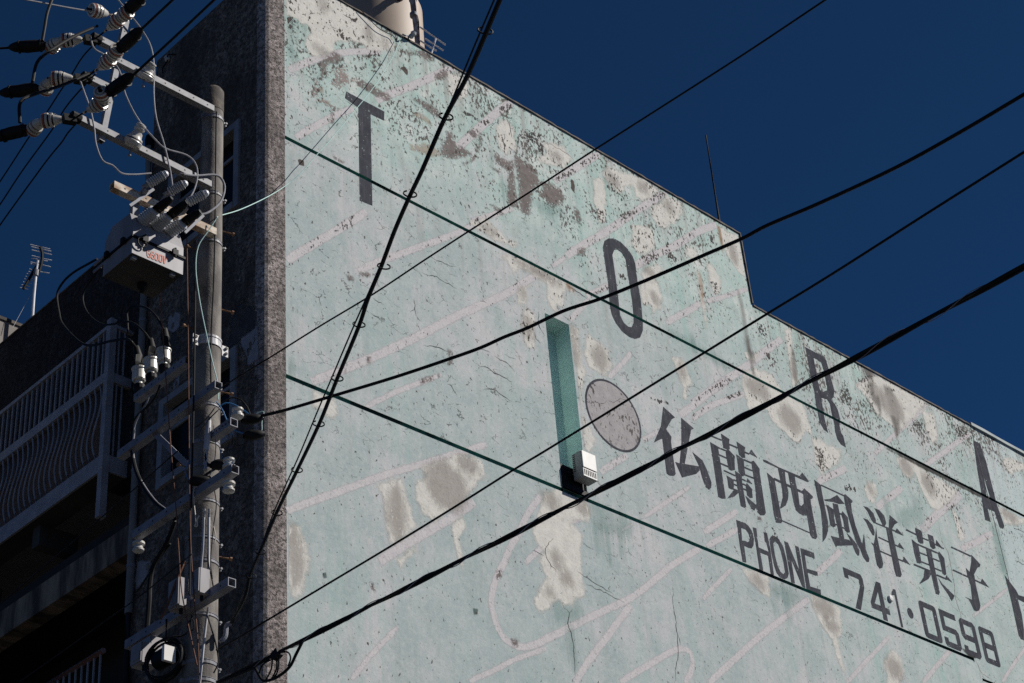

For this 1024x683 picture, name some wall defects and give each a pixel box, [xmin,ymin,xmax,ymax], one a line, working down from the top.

peeling [312,53,391,123]
peeling [401,51,434,75]
peeling [416,99,441,124]
peeling [493,154,575,215]